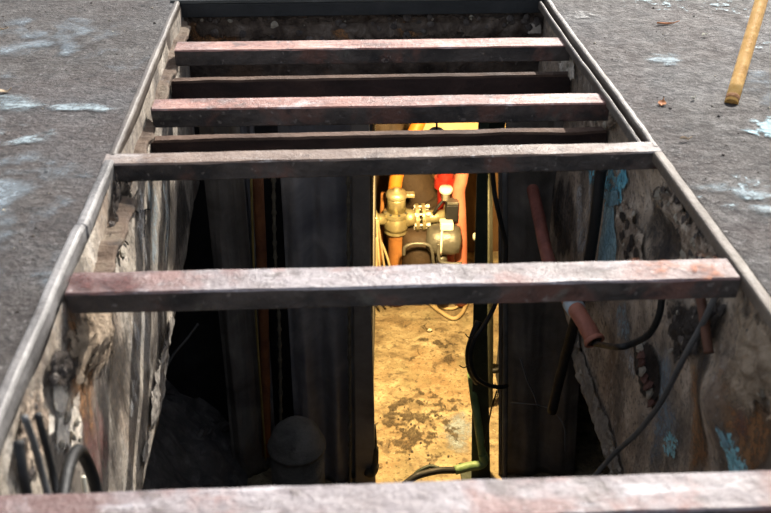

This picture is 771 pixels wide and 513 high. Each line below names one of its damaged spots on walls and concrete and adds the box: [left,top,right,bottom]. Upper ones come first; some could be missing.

spalling [109,179,133,236]
crack [125,189,151,245]
spalling [615,199,644,261]
spalling [652,184,720,260]
spalling [142,317,175,465]